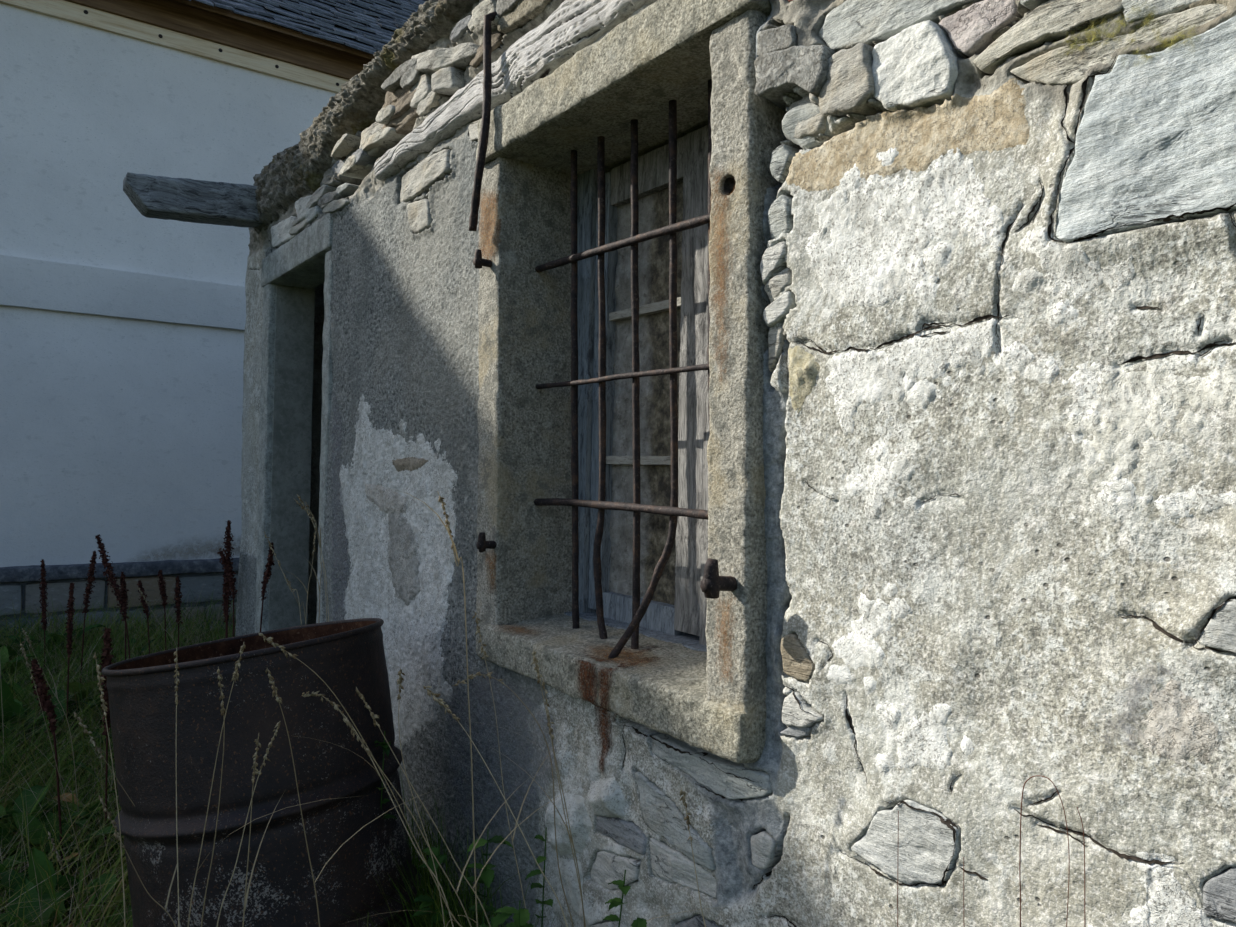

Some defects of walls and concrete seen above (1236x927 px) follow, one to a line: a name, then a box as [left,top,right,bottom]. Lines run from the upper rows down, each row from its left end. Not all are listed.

corrosion [479,195,513,259]
crack [792,57,1236,357]
crack [1118,317,1236,365]
flaking render [337,394,459,750]
corrosion [577,646,661,771]